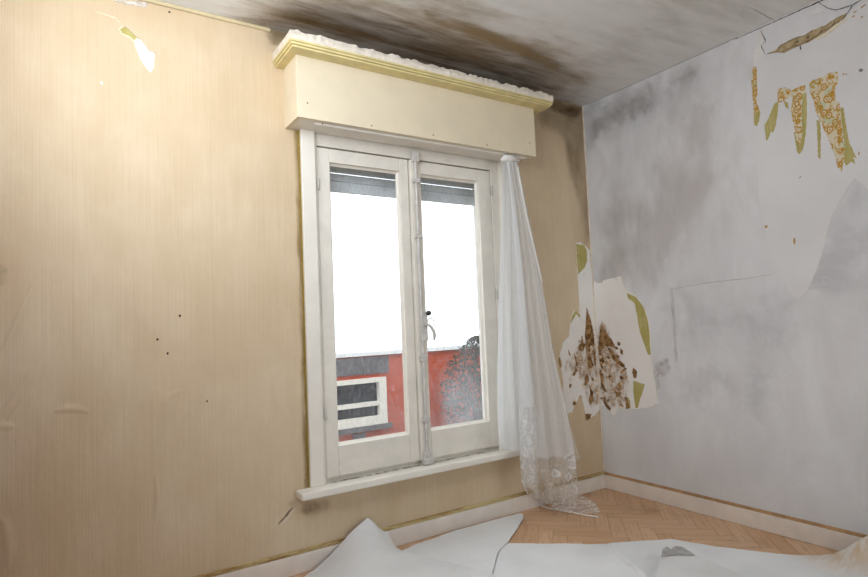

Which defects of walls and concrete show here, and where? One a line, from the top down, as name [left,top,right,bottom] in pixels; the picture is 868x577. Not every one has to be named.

peeling [120,27,155,72]
flaking render [766,4,866,55]
peeling [559,242,659,418]